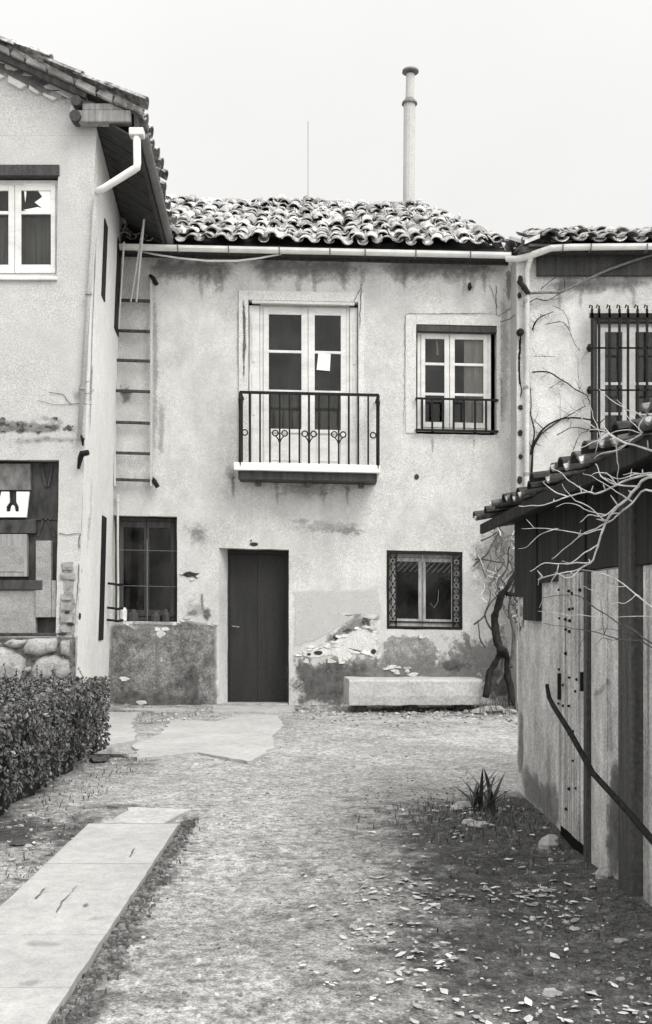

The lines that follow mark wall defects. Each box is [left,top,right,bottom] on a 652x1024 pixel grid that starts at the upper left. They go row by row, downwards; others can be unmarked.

water stain [256,260,356,278]
water stain [393,263,489,279]
water stain [115,636,203,706]
water stain [326,617,372,642]
peeling [295,625,442,676]
water stain [292,628,508,705]